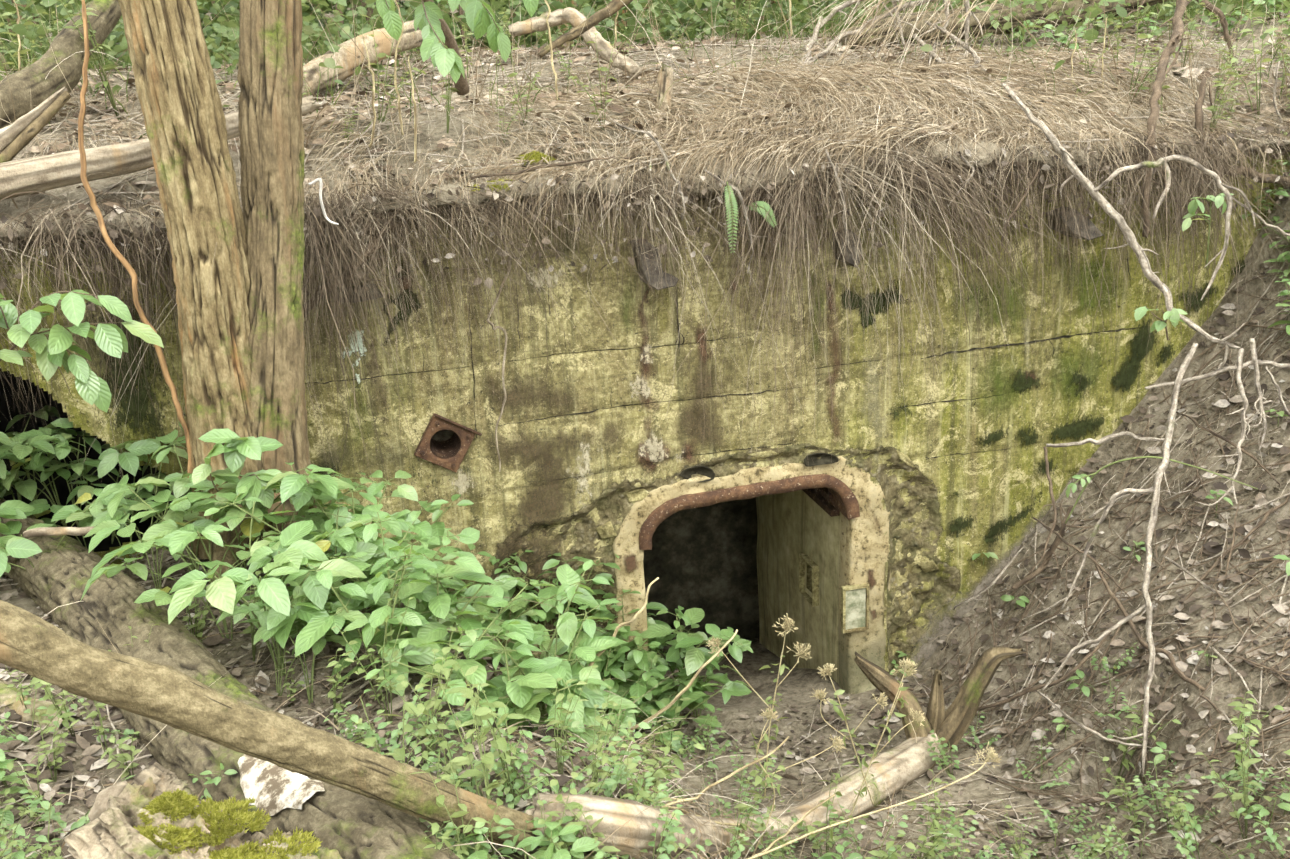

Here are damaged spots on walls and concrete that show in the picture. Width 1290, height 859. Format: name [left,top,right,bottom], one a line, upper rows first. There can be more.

crack [921,327,1139,359]
water stain [630,376,650,399]
water stain [640,434,684,462]